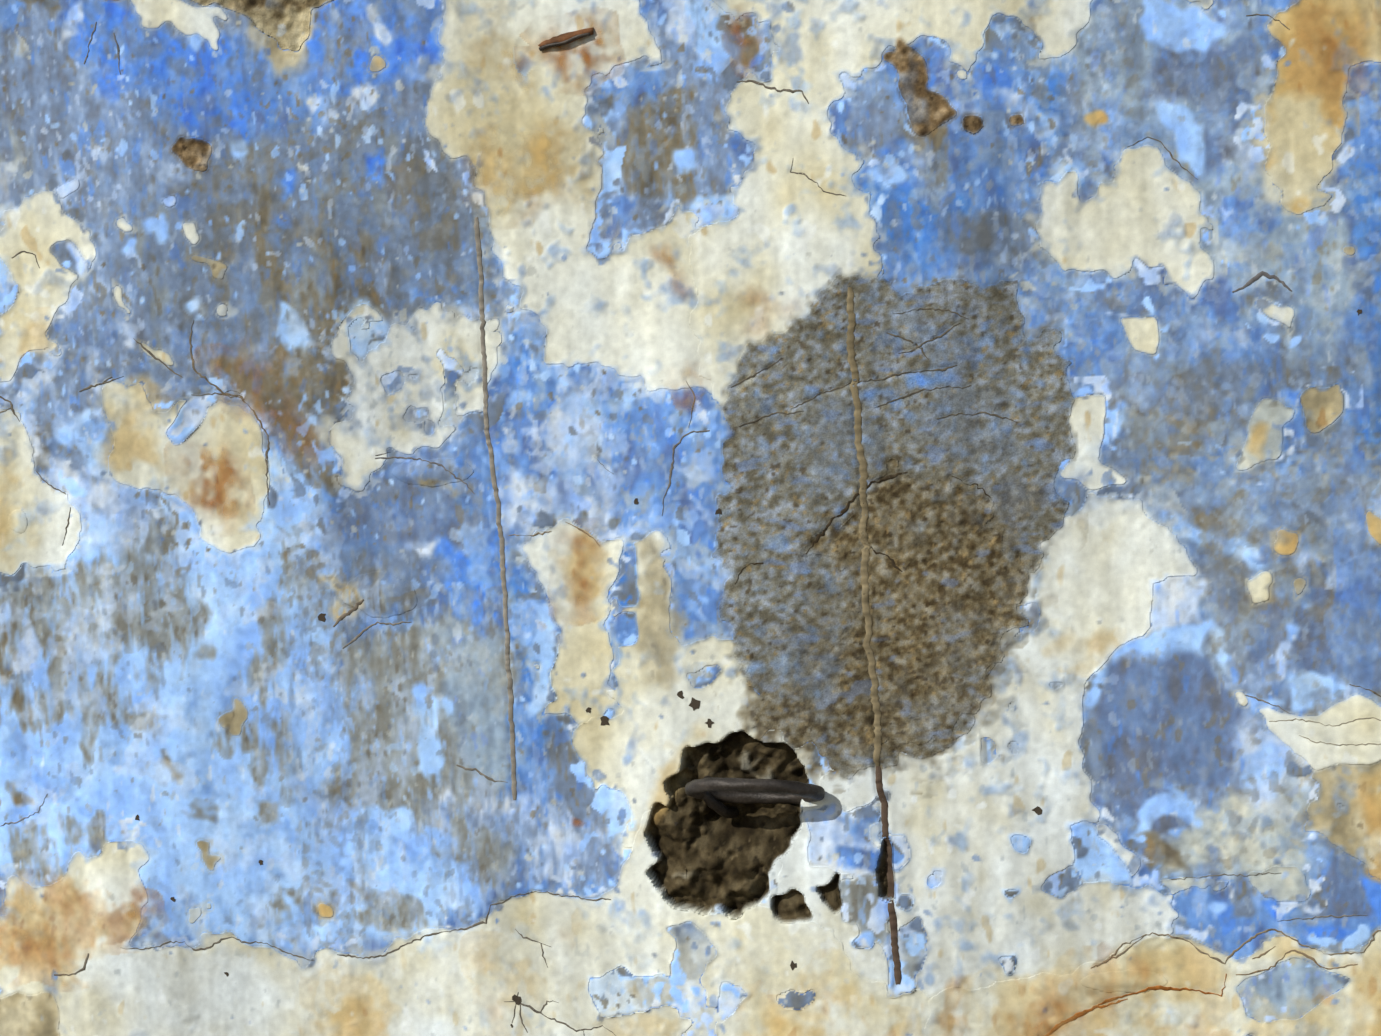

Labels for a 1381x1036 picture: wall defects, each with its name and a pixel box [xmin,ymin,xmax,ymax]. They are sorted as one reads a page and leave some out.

flaking render [112,0,333,51]
corrosion [544,30,603,69]
peeling [183,223,227,279]
peeling [329,0,1092,492]
peeling [1036,144,1214,299]
peeling [1121,317,1159,354]
crack [0,396,19,420]
crack [79,376,123,392]
crack [133,320,270,505]
crack [36,471,71,545]
peeling [0,381,1381,1036]
crack [1046,914,1381,1036]